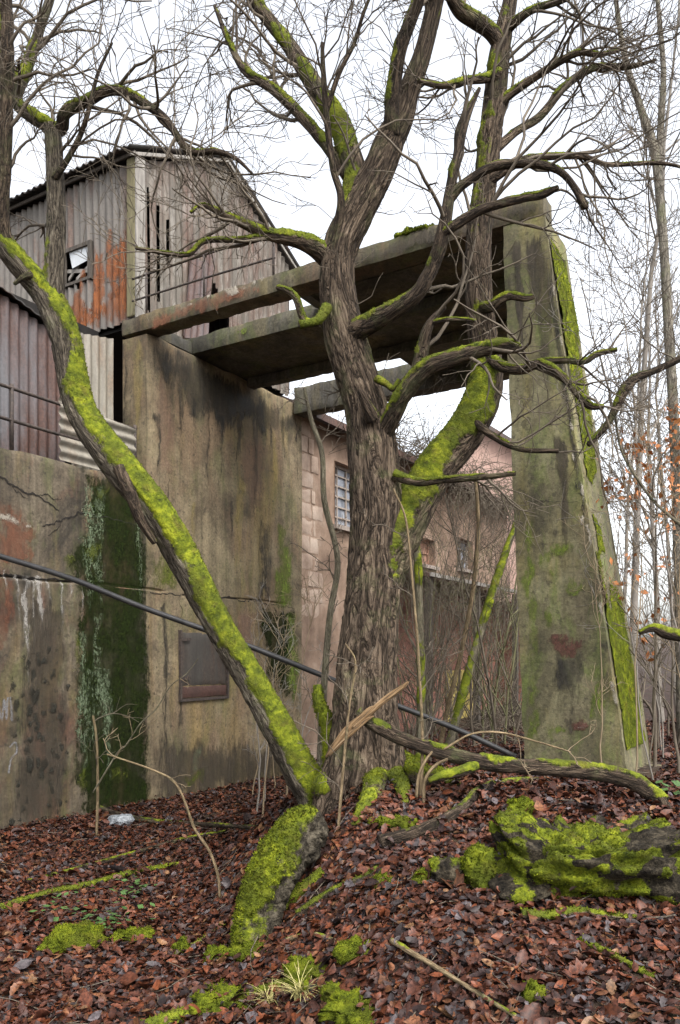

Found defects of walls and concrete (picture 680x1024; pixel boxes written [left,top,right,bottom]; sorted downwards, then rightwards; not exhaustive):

corrosion [71,227,127,327]
leakage [157,350,302,478]
leakage [512,236,591,546]
crack [0,476,139,536]
leakage [5,575,47,646]
leakage [61,474,282,814]
leakage [550,634,584,690]